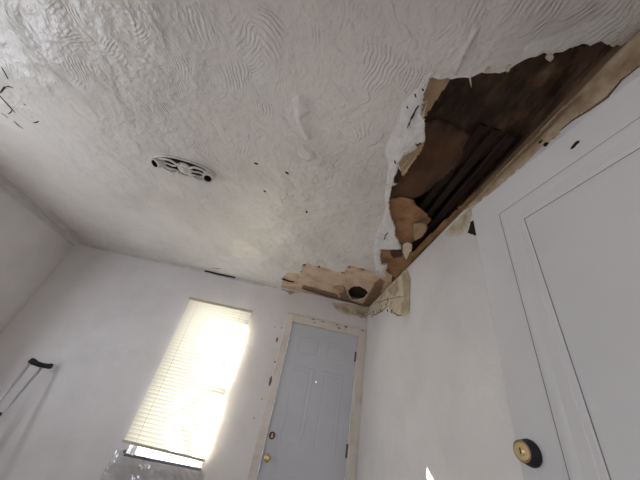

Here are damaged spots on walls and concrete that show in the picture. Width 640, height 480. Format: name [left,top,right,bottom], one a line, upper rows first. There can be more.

peeling [197,70,435,319]
damp [480,90,586,197]
flaking render [445,30,640,237]